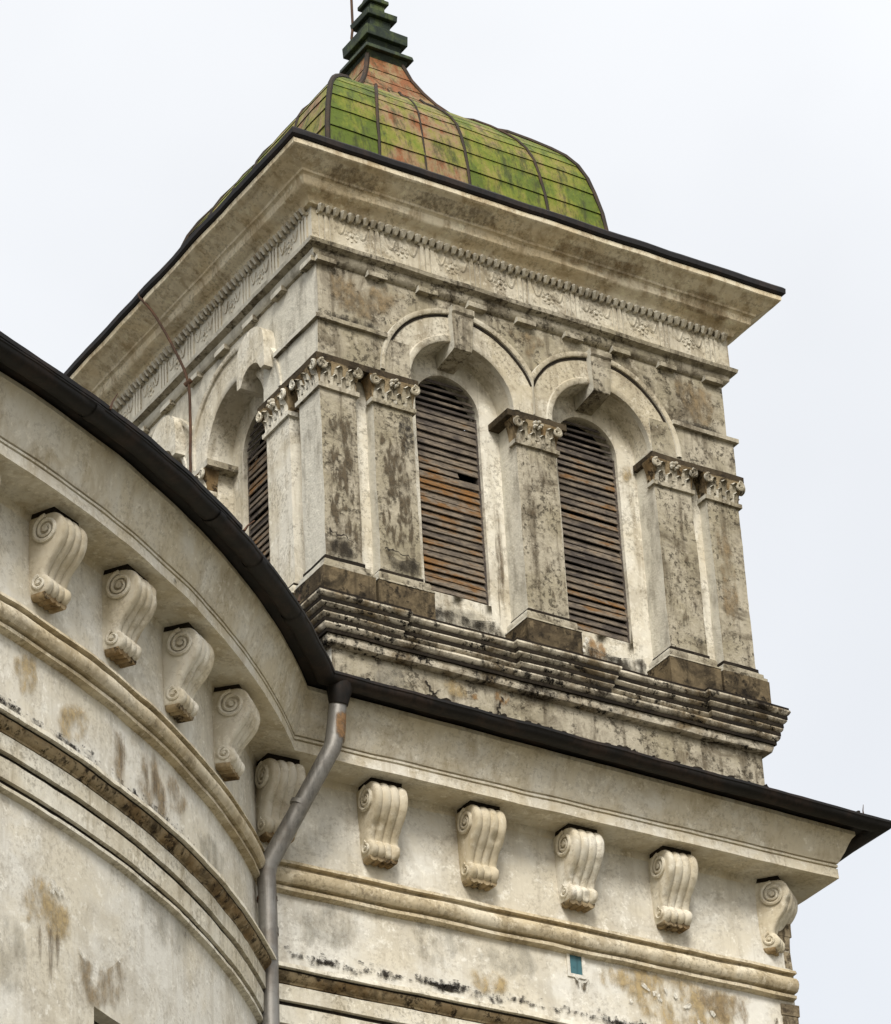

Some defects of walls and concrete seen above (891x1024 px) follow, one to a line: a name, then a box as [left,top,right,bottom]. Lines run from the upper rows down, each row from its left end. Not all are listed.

water stain [556,247,634,277]
rust [336,712,346,743]
water stain [39,881,68,967]
water stain [284,946,646,1024]